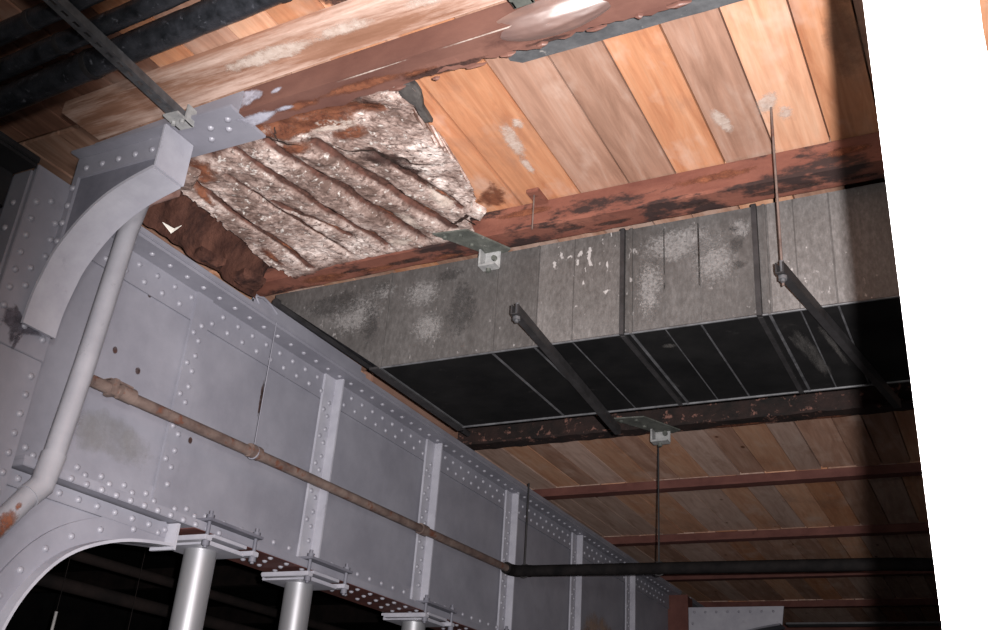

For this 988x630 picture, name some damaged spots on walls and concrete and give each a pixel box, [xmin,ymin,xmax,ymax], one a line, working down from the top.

peeling [240,87,292,126]
peeling [398,80,433,123]
leakage [757,182,822,196]
peeling [464,201,487,221]
rust [0,504,21,537]